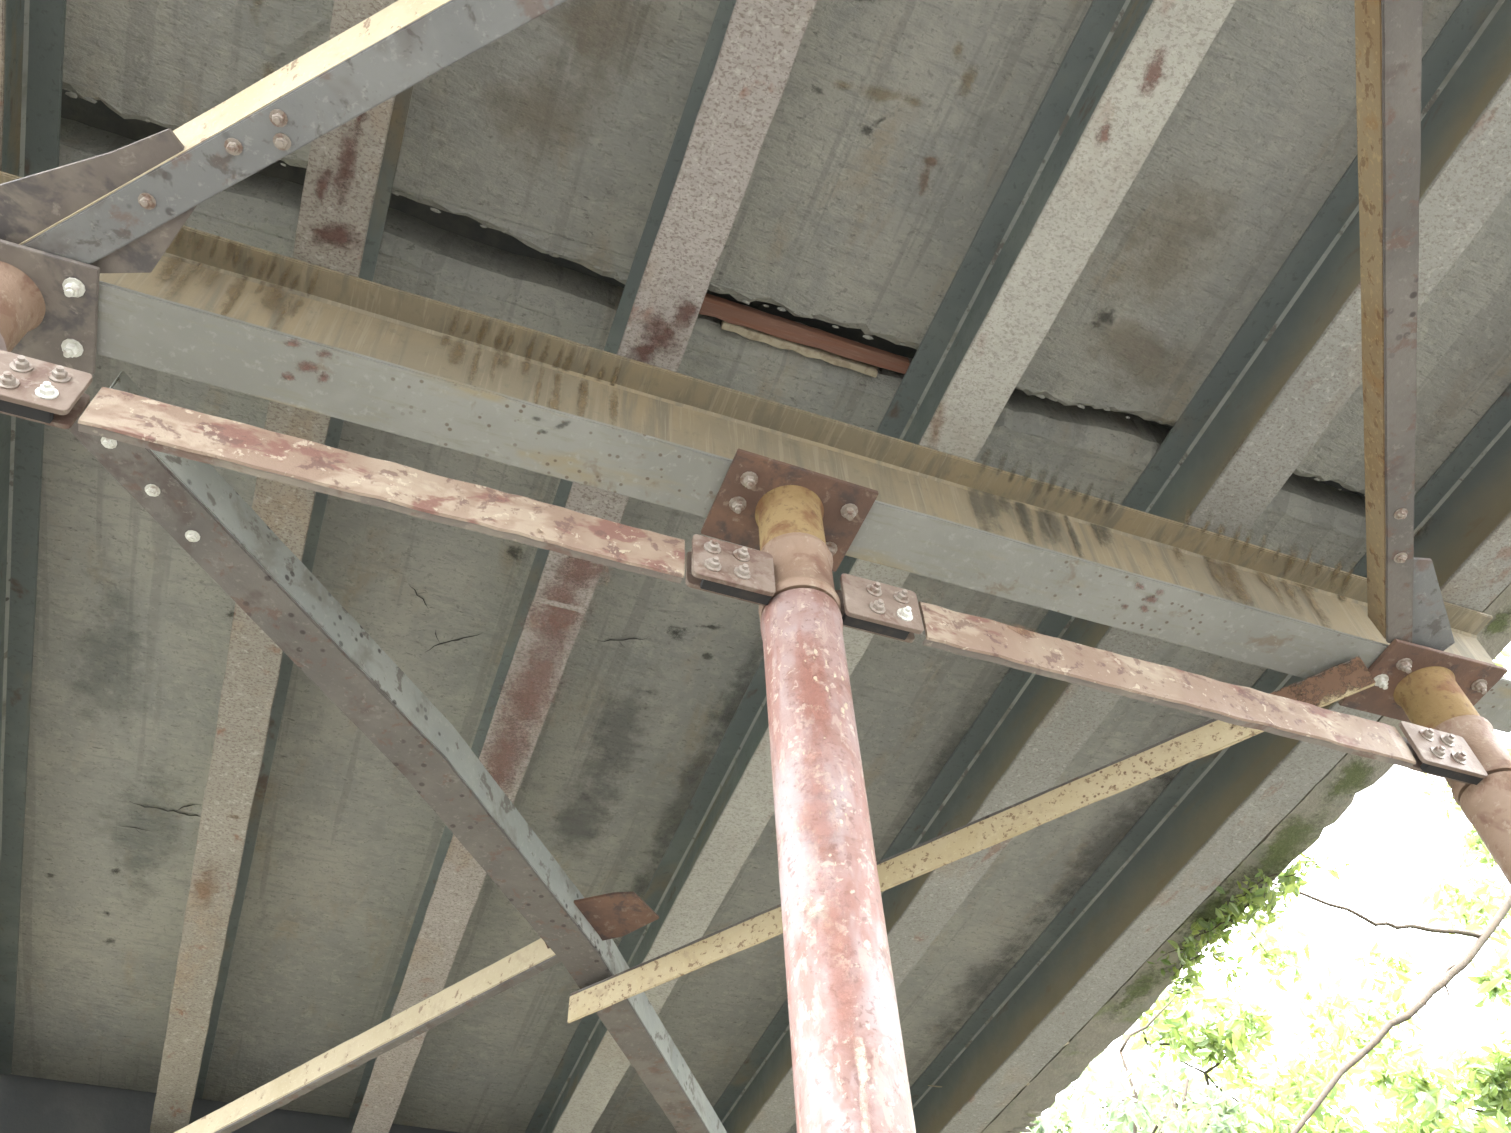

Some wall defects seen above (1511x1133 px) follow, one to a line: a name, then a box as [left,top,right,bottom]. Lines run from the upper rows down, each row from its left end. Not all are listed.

rust [317,113,365,199]
rust [313,226,352,247]
rust [634,301,696,361]
rust [485,556,608,790]
crack [117,803,200,832]